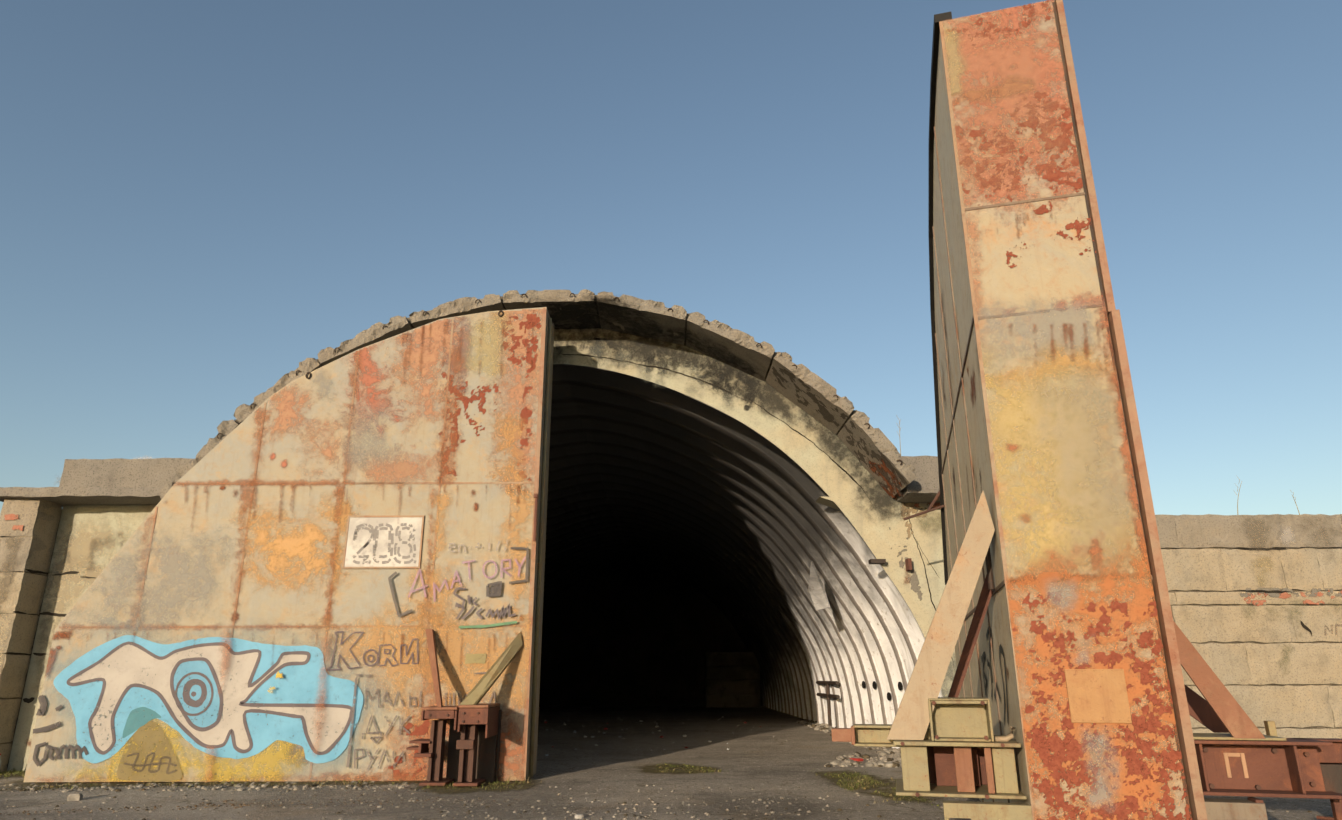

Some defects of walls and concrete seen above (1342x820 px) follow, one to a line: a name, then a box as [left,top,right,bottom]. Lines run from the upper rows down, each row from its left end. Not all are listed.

rust [946,0,1081,207]
rust [267,386,351,463]
damp [646,359,676,373]
rust [239,503,352,589]
rust [327,307,546,781]
rust [1006,297,1178,820]